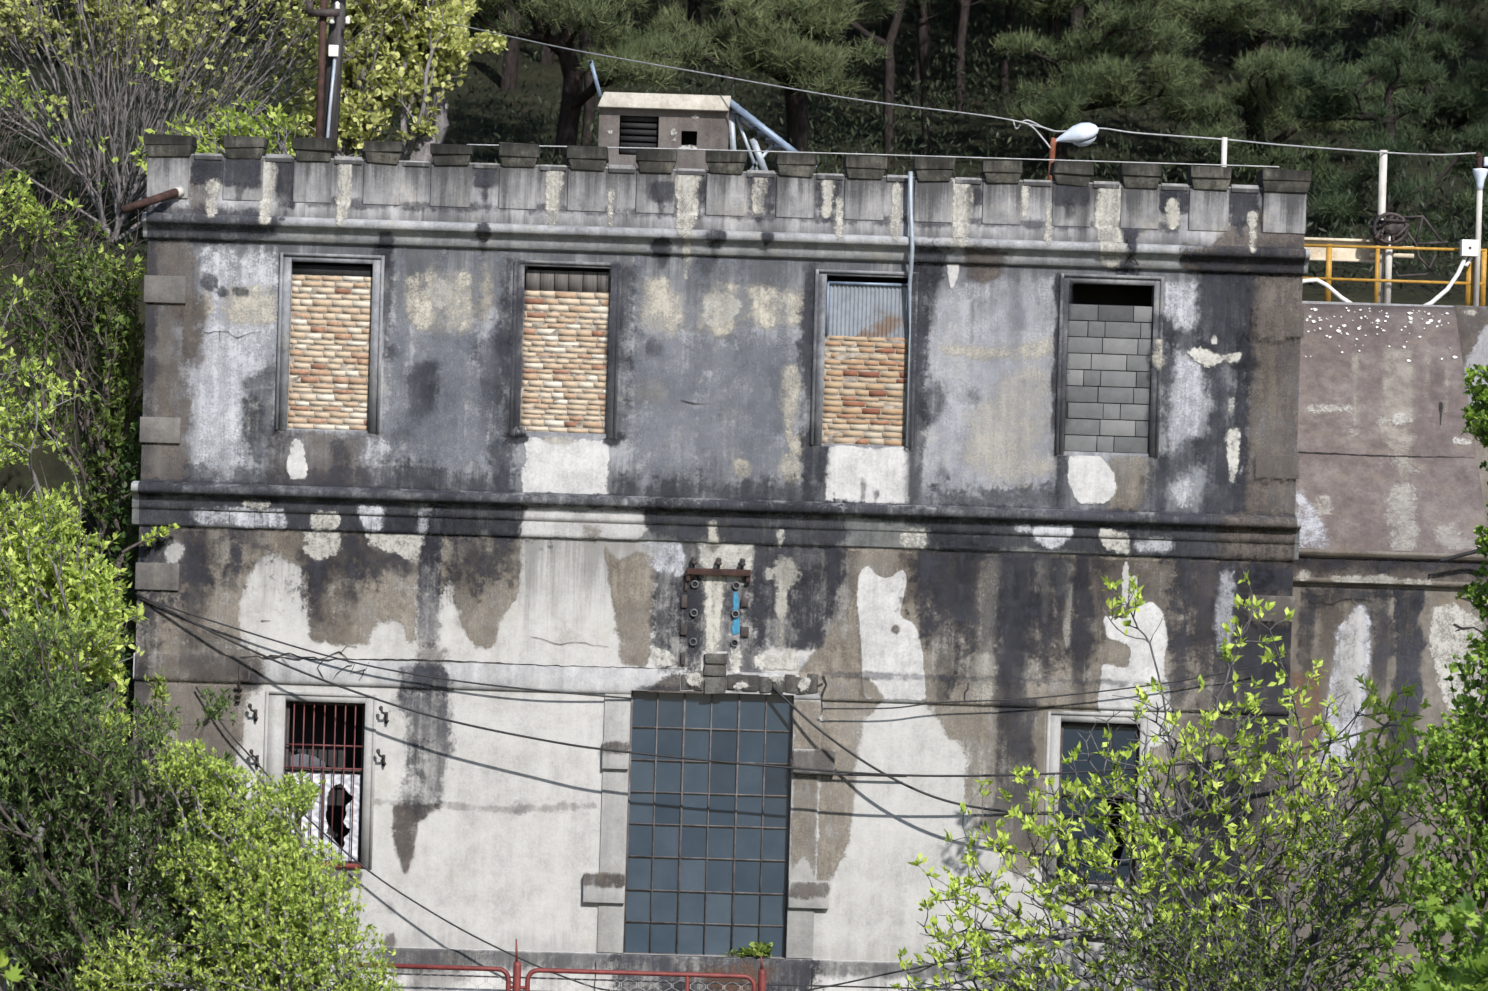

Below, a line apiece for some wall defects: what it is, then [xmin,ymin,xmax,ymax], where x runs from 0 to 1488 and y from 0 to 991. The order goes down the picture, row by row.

peeling [1187,335,1242,368]
peeling [939,339,1116,504]
peeling [286,439,308,480]
peeling [517,436,649,541]
peeling [825,445,910,504]
peeling [1225,428,1241,482]
peeling [899,529,927,549]
peeling [1015,524,1073,549]
leakage [130,158,1488,991]
peeling [857,566,926,701]
peeling [1097,528,1172,748]
peeling [1111,892,1135,922]